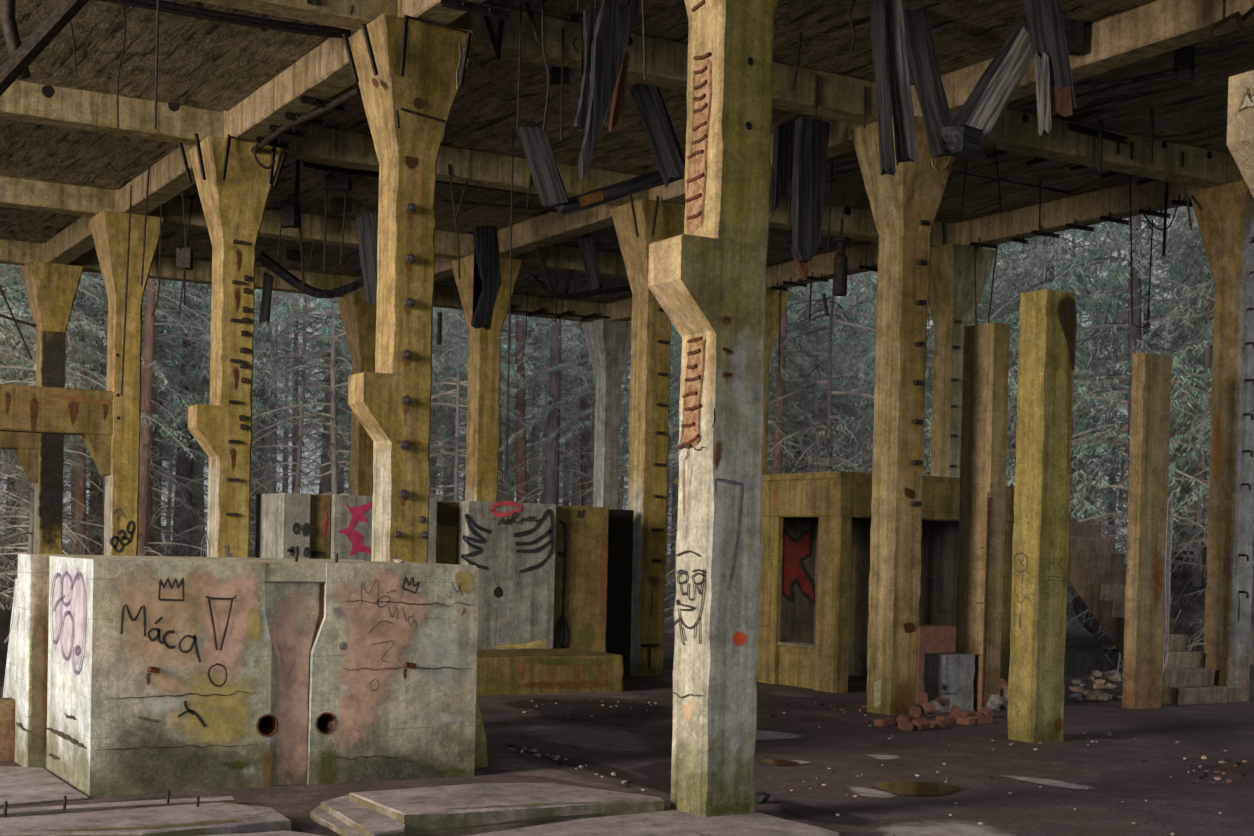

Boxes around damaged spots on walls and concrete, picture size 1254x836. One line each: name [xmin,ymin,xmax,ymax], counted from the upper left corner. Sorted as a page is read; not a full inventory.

rust [30,397,38,435]
rust [59,395,110,425]